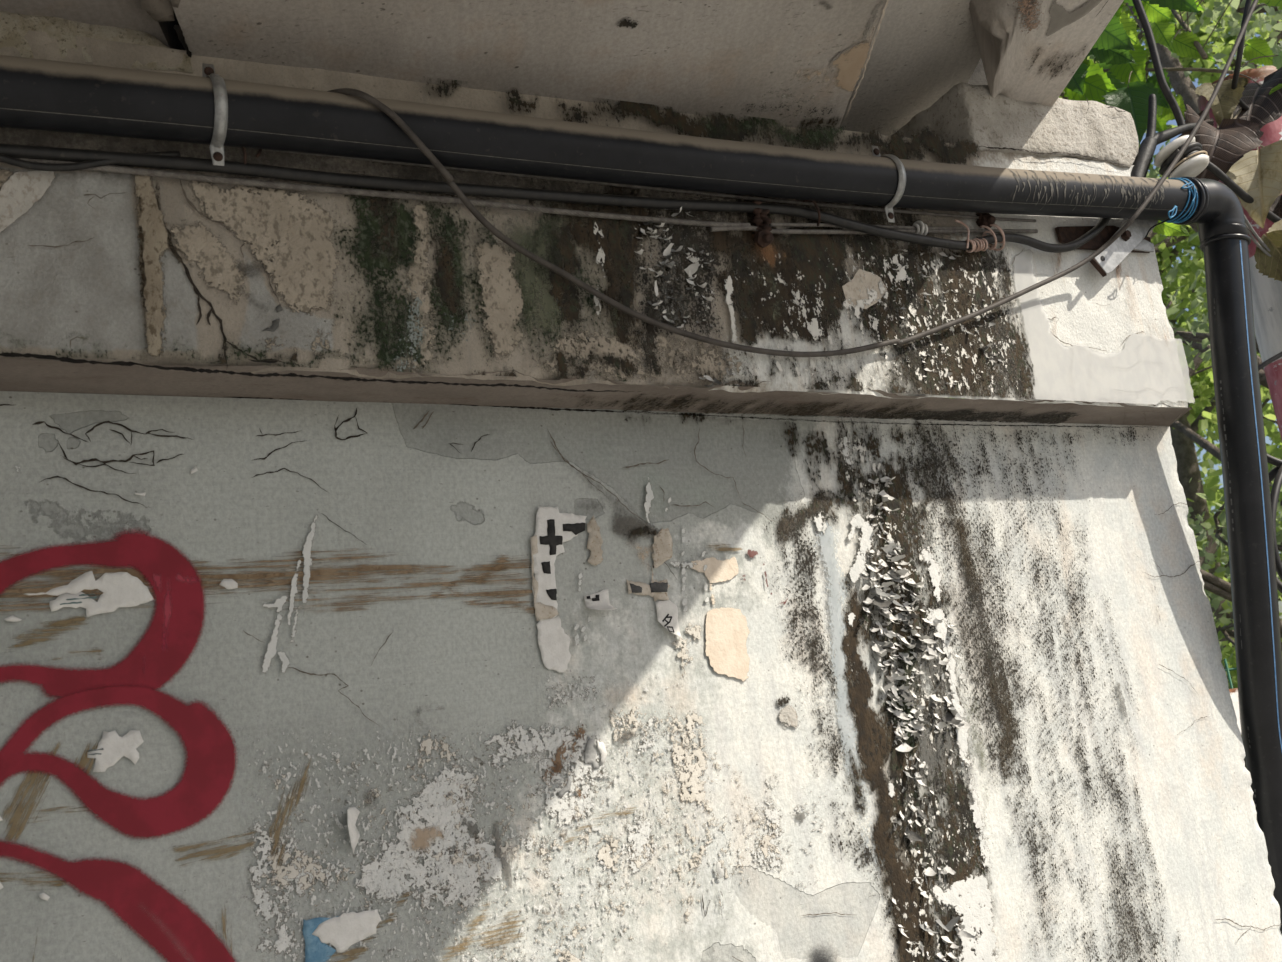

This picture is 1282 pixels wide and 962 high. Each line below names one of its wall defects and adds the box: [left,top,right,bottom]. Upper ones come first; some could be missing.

crack [28,192,126,248]
crack [180,180,280,304]
flaking render [171,180,341,354]
flaking render [403,201,445,373]
leakage [334,188,516,377]
flaking render [475,239,525,363]
crack [0,226,1182,544]
peeling [814,507,828,534]
leakage [486,178,1195,962]
peeling [242,557,826,962]
peeling [838,434,999,962]